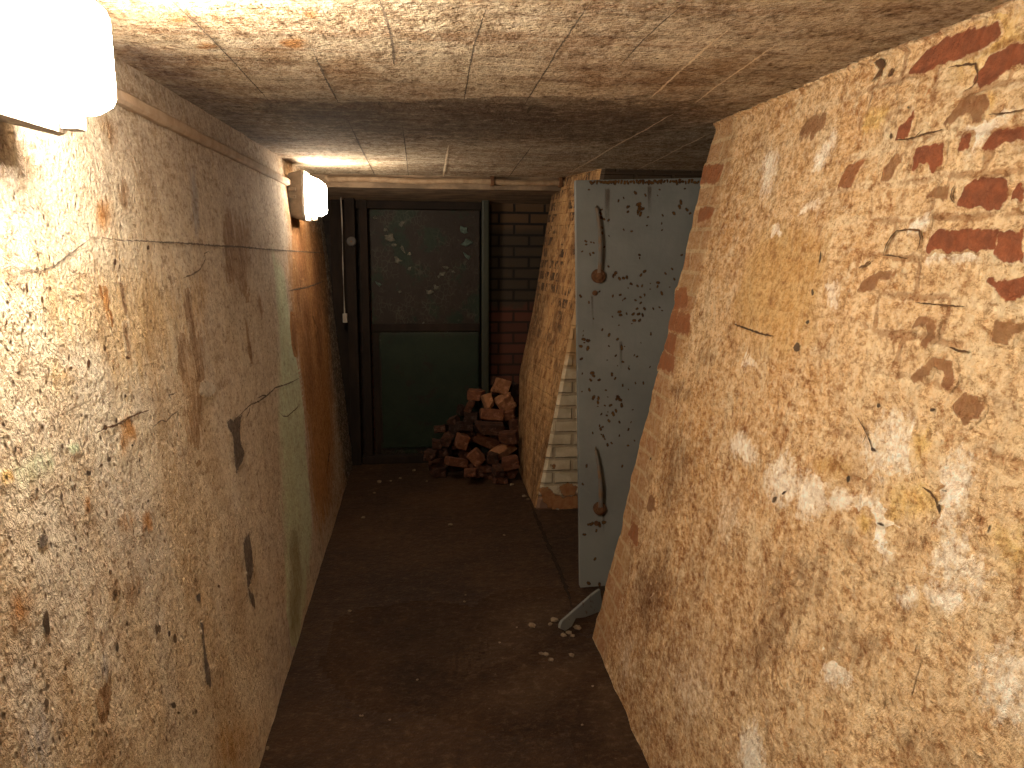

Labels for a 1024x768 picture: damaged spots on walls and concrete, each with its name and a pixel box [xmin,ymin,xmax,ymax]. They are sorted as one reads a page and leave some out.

spalling [872,58,893,81]
flaking render [837,156,867,192]
flaking render [880,19,1024,349]
corrosion [89,266,131,358]
flaking render [657,284,693,375]
flaking render [856,266,902,296]
crack [97,410,177,433]
spalling [227,415,245,473]
crack [239,379,298,417]
leakage [612,122,1024,768]
flaking render [909,311,989,430]
spalling [243,534,255,608]